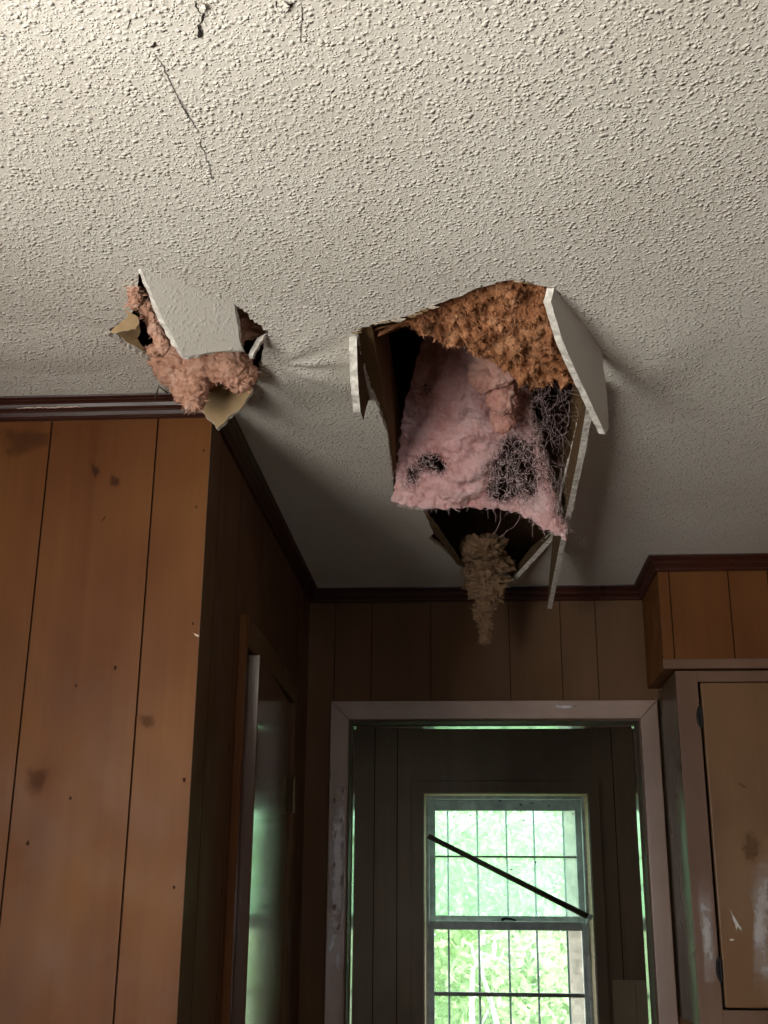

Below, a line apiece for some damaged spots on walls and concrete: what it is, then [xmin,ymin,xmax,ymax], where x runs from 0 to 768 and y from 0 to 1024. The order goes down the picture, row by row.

crack [157,59,213,180]
spalling [249,333,268,359]